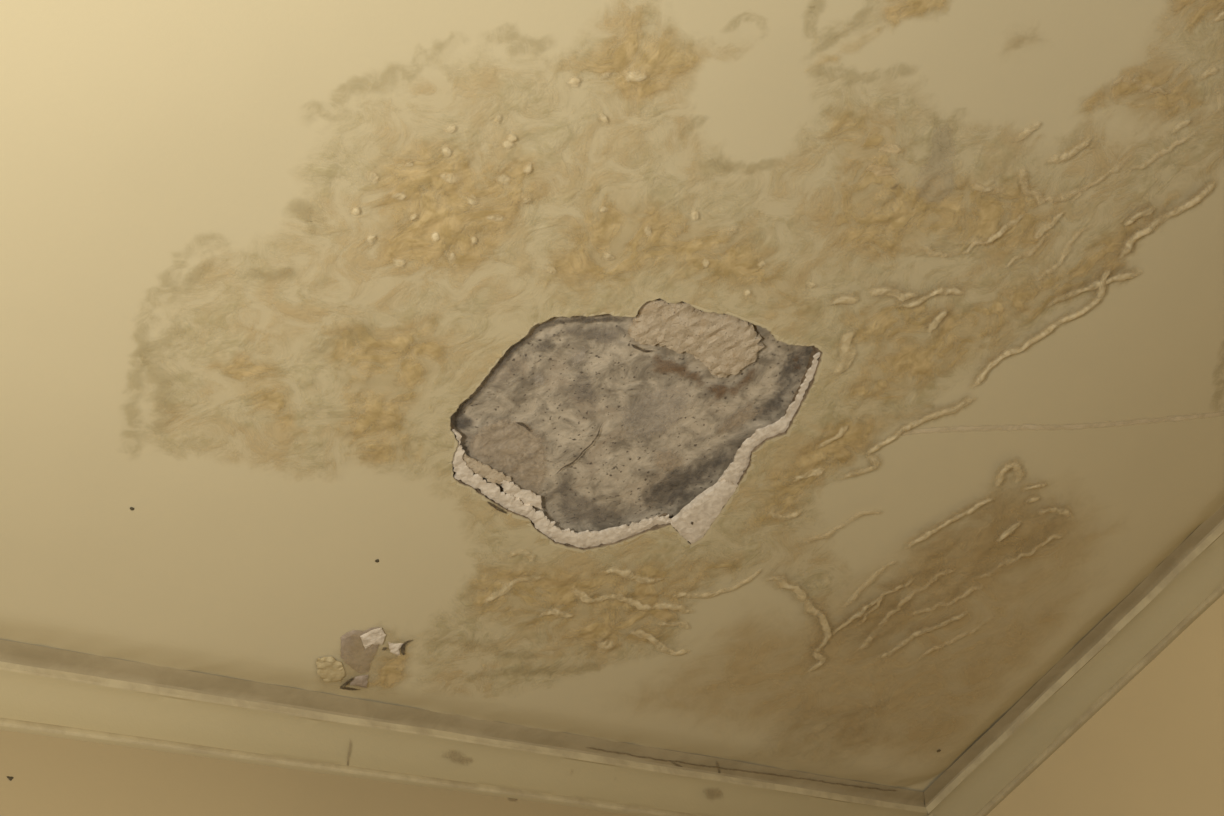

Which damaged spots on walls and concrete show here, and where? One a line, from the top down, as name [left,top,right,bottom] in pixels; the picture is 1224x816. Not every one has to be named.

flaking render [450,299,824,551]
leakage [165,0,1224,690]
peeling [316,627,411,690]